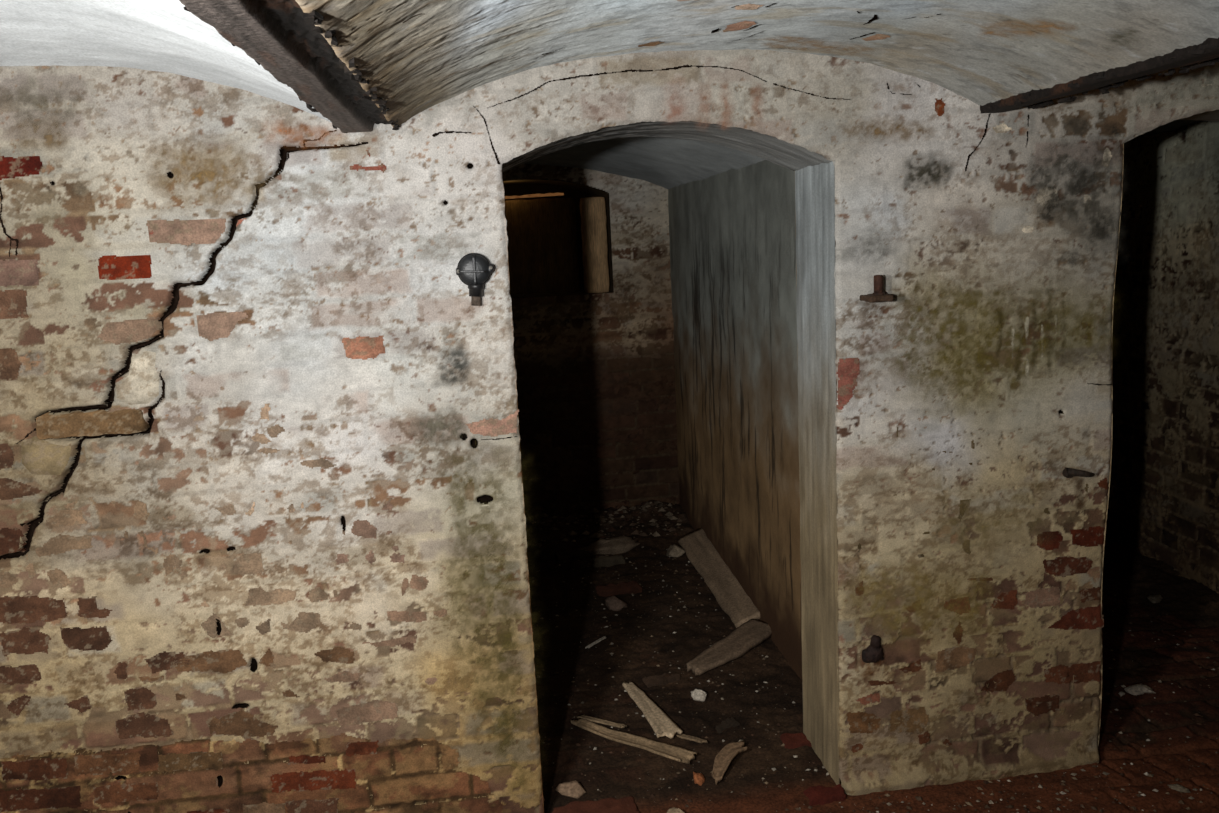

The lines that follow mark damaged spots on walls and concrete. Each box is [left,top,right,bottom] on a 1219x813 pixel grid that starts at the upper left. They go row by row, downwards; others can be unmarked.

crack [432,30,850,164]
flaking render [0,156,43,180]
crack [965,113,991,171]
flaking render [98,218,246,280]
flaking render [0,348,22,381]
crack [0,130,368,560]
flaking render [196,312,248,341]
flaking render [342,335,385,360]
leakage [899,291,1070,386]
flaking render [1037,525,1106,577]
peeling [0,502,112,717]
peeling [0,553,503,813]